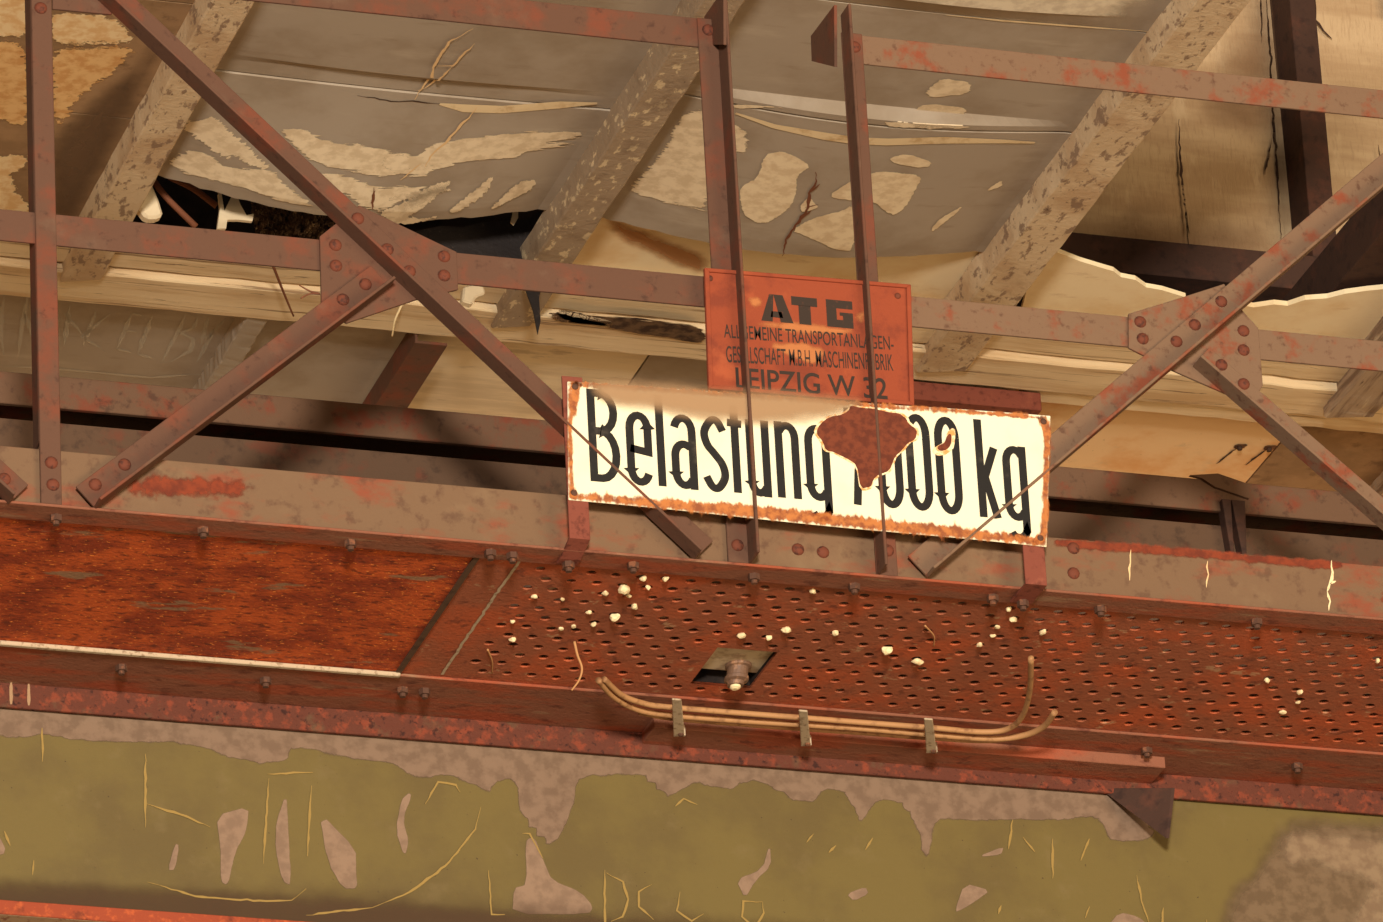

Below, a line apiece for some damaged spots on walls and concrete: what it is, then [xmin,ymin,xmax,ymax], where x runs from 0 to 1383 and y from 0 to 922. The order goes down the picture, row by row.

peeling [169,116,312,231]
peeling [282,128,582,225]
peeling [631,111,707,211]
peeling [735,125,750,152]
peeling [740,151,854,251]
crack [782,172,820,256]
peeling [871,154,932,215]
peeling [885,79,971,129]
peeling [932,207,962,231]
corrosion [130,475,245,497]
peeling [0,708,1154,914]
water stain [1285,834,1383,922]